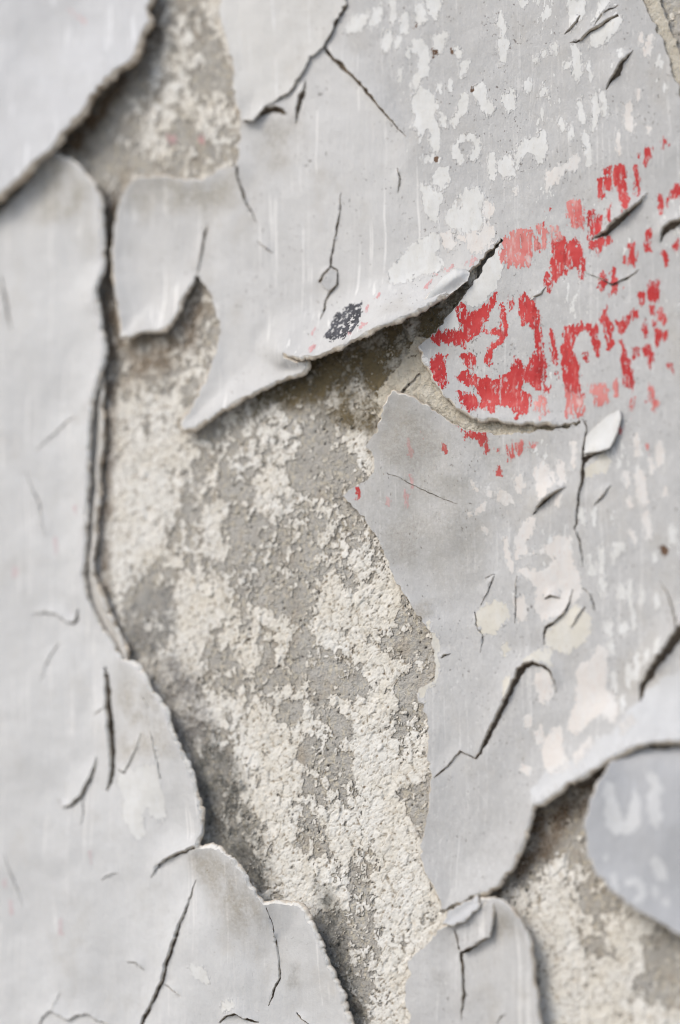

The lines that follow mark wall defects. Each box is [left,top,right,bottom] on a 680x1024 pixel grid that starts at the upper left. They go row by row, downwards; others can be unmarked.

crack [244,6,405,136]
peeling [460,139,474,156]
crack [533,421,611,559]
crack [434,588,595,778]
crack [640,591,680,701]
peeling [645,642,680,689]
crack [63,670,126,813]
peeling [601,778,644,838]
peeling [645,768,665,833]
peeling [609,867,672,908]
peeling [650,853,669,884]
crack [142,881,196,1024]